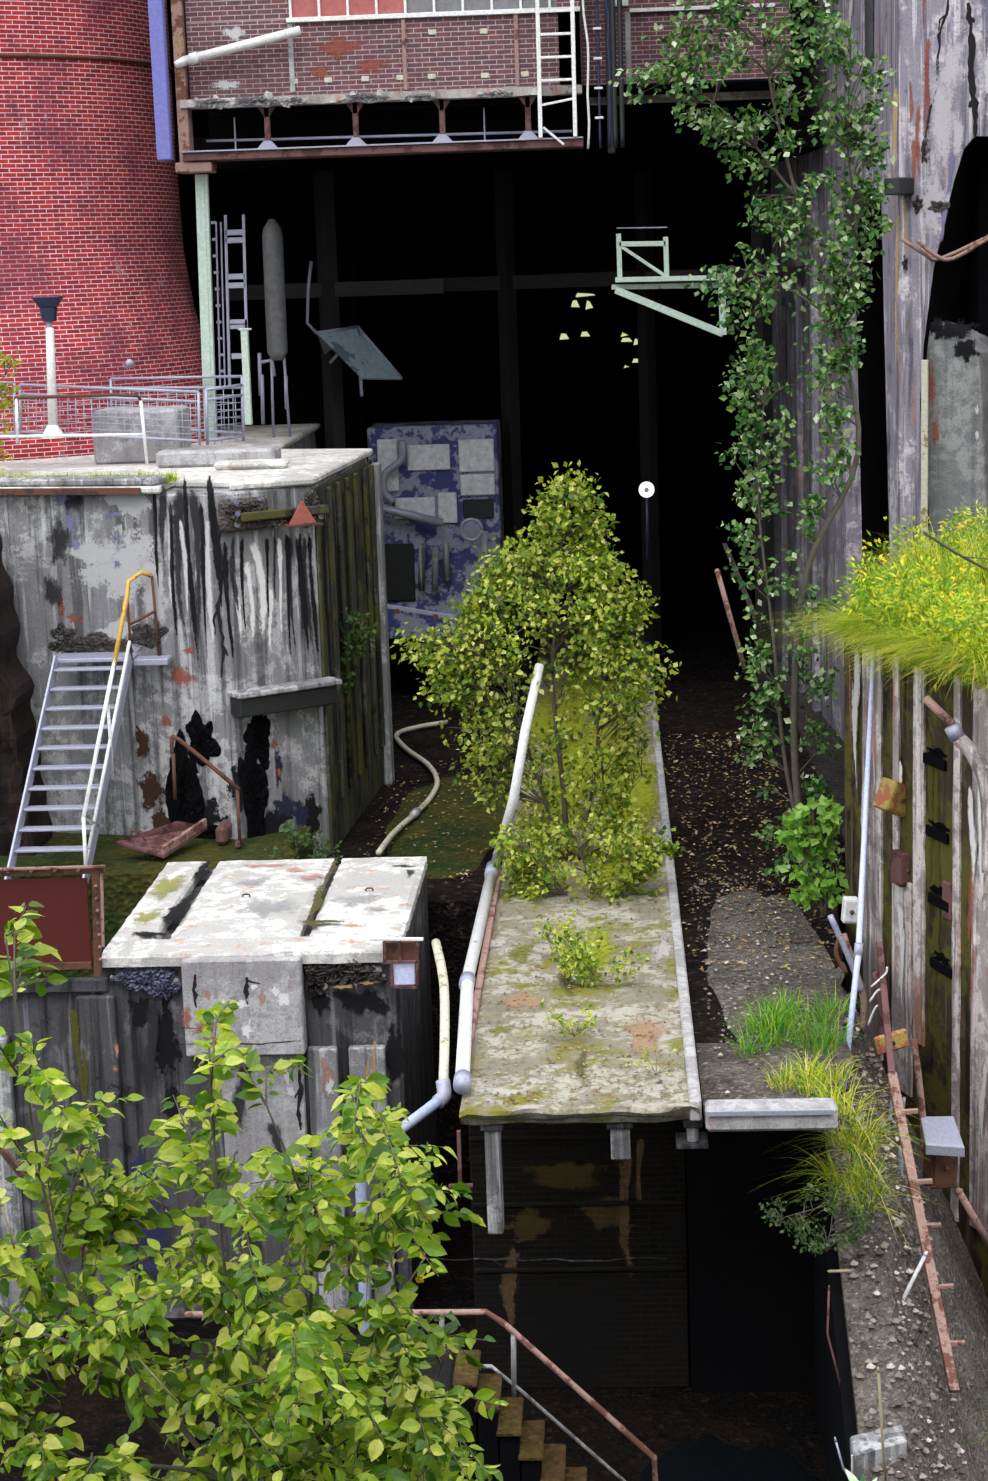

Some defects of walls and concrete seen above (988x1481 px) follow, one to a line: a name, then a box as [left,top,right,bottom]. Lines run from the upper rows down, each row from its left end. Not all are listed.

corrosion [909,0,930,203]
crack [924,0,979,138]
damp [152,476,365,728]